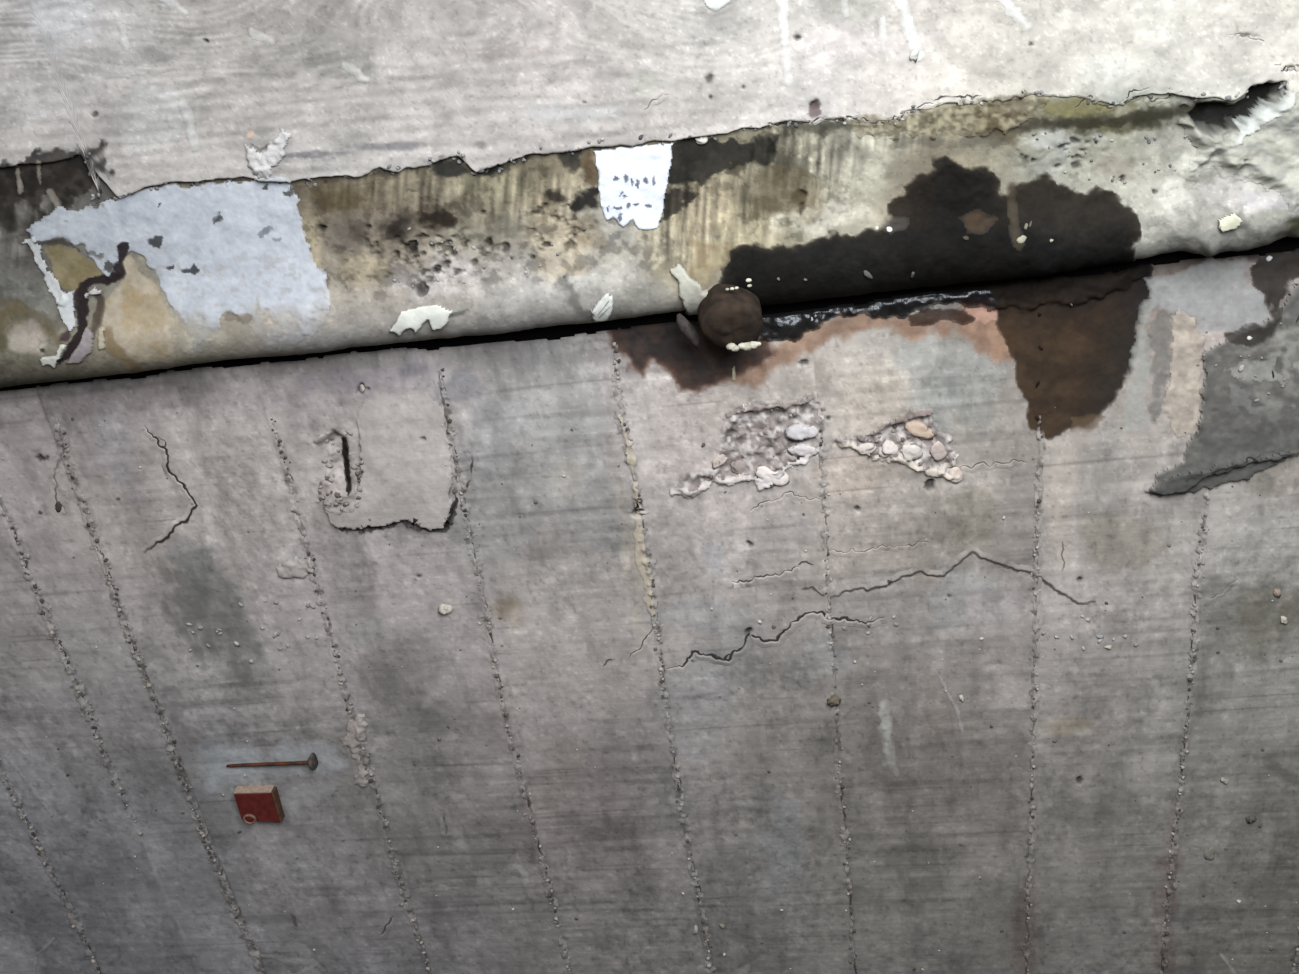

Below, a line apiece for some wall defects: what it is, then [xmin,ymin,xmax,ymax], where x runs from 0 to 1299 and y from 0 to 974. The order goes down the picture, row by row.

spalling [1128,64,1288,131]
peeling [21,128,331,373]
water stain [307,168,467,256]
water stain [423,151,536,179]
water stain [530,146,601,236]
water stain [726,286,996,352]
rust [605,264,1155,441]
water stain [1119,248,1299,438]
crack [141,426,198,553]
peeling [312,375,474,533]
spalling [670,391,966,499]
crack [603,541,1098,674]